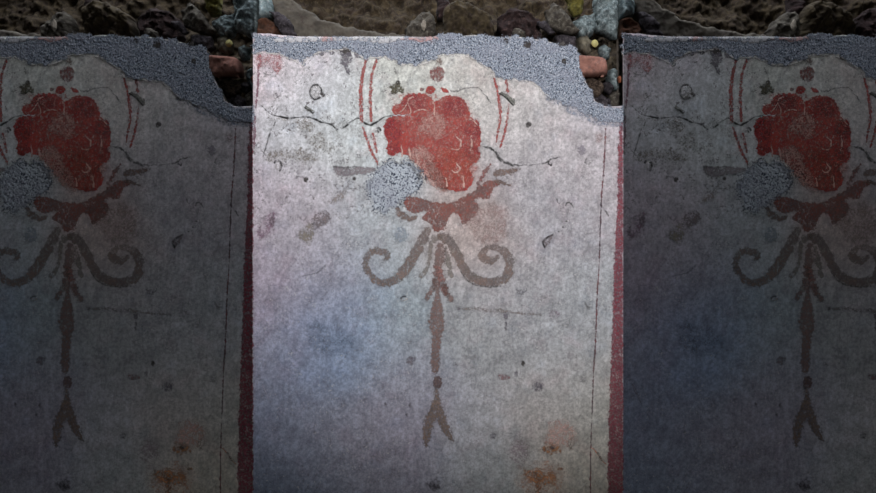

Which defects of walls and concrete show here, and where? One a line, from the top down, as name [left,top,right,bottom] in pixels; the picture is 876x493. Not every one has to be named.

flaking render [0,19,255,126]
flaking render [250,20,625,126]
flaking render [620,19,876,81]
crack [262,106,405,151]
crack [484,146,558,166]
crack [632,106,775,156]
flaking render [0,158,56,215]
flaking render [353,157,426,215]
flaking render [723,158,796,215]